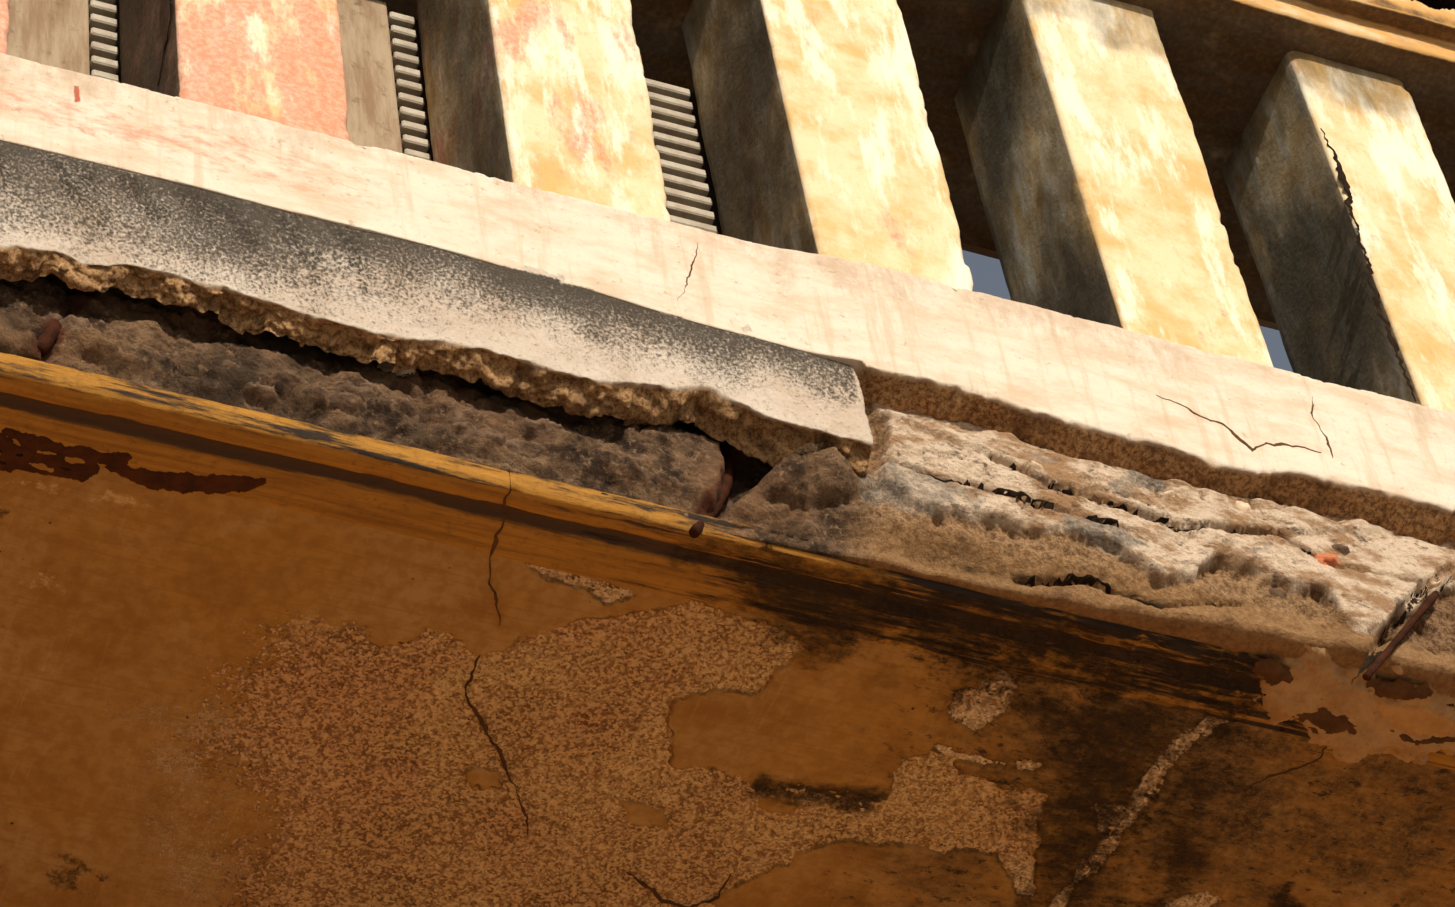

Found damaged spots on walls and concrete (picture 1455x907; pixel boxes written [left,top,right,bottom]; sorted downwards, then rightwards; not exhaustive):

crack [1411,0,1455,10]
rust [37,291,87,357]
crack [464,655,528,836]
crack [488,465,512,626]
spalling [155,564,1048,907]
spalling [0,273,1455,698]
leakage [676,521,1265,907]
peeling [1049,716,1228,907]
crack [1157,395,1333,458]
rust [1362,591,1439,681]